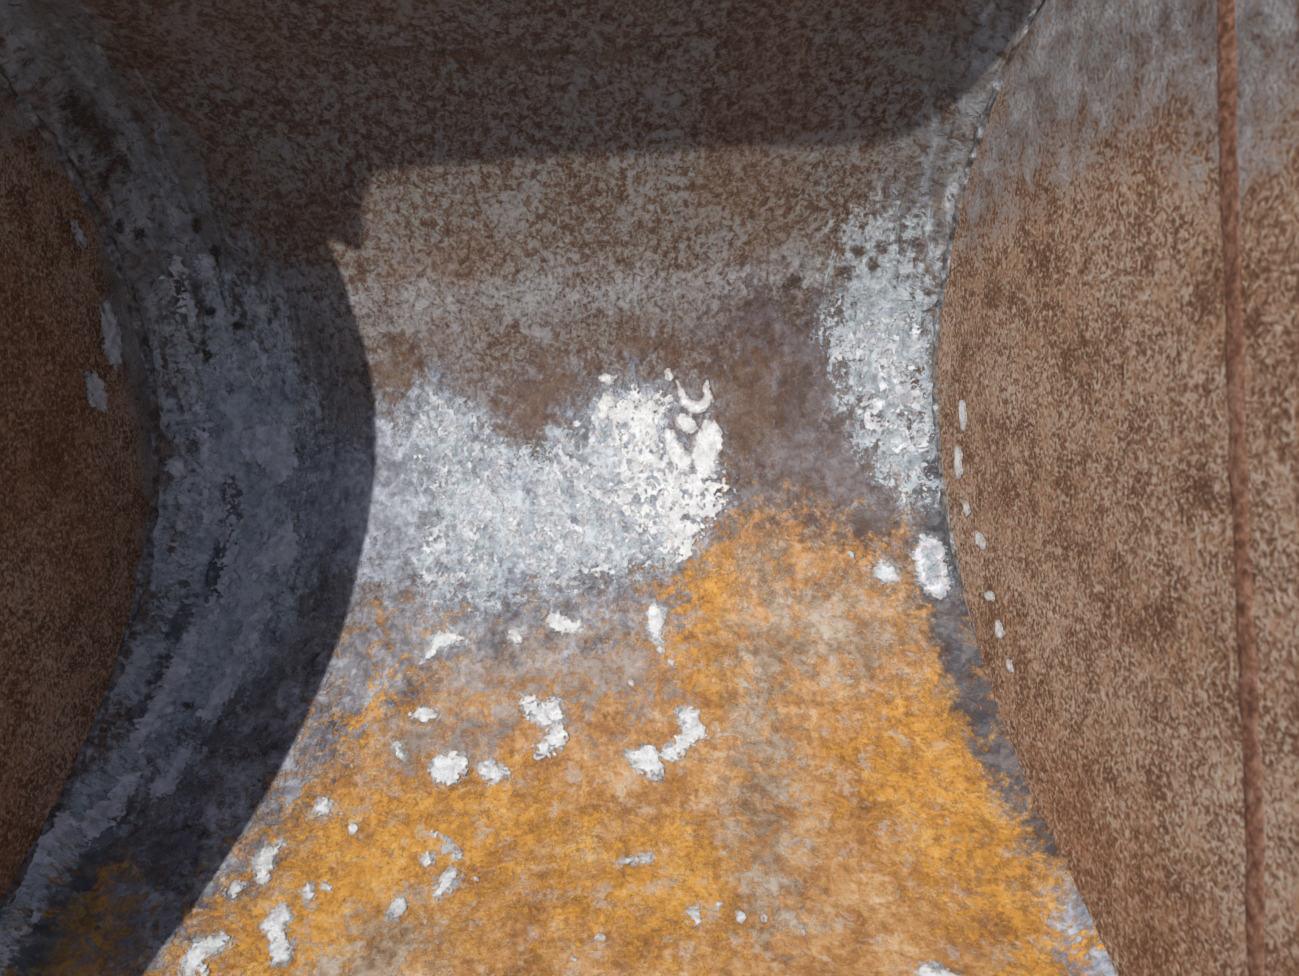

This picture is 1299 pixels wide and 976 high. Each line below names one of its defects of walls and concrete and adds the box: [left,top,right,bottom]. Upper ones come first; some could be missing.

water stain [7,794,135,976]
water stain [121,473,244,735]
rust [0,323,1109,976]
water stain [697,261,1118,976]